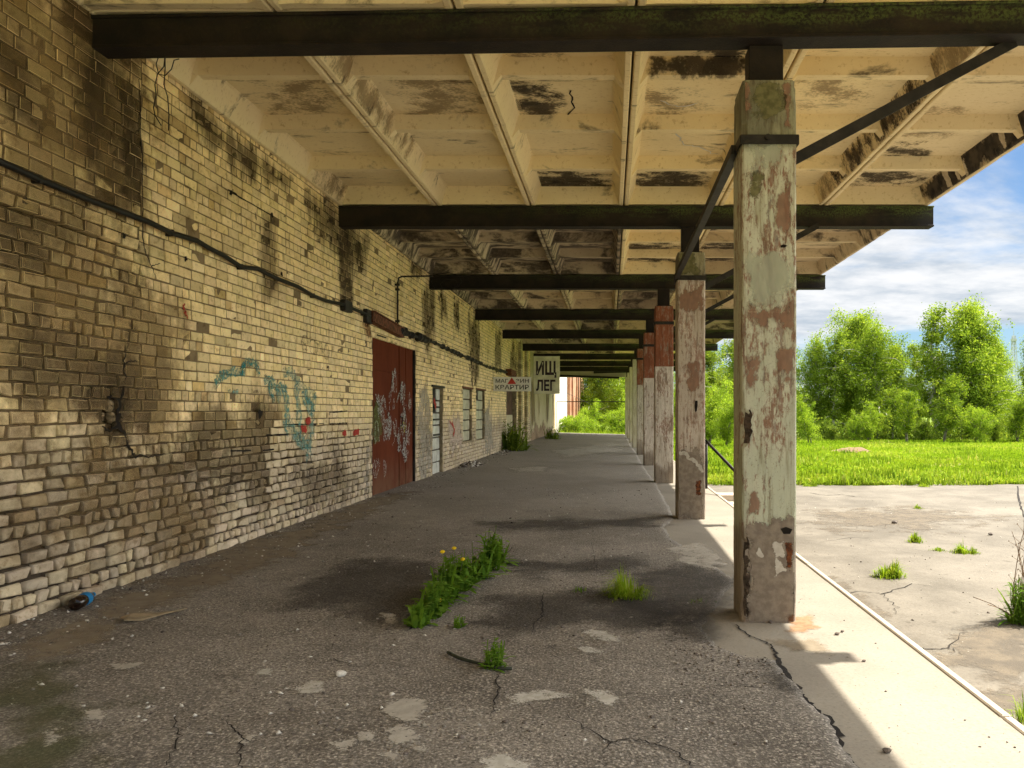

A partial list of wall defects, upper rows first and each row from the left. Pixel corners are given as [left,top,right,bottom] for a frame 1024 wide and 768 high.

damp [649,50,746,79]
damp [510,82,565,115]
damp [190,93,291,183]
damp [537,171,612,186]
damp [636,171,711,186]
peeling [775,182,791,248]
peeling [748,289,795,382]
crack [102,336,165,459]
spalling [744,410,753,443]
peeling [743,492,795,621]
crack [735,624,857,766]
crack [567,714,695,766]